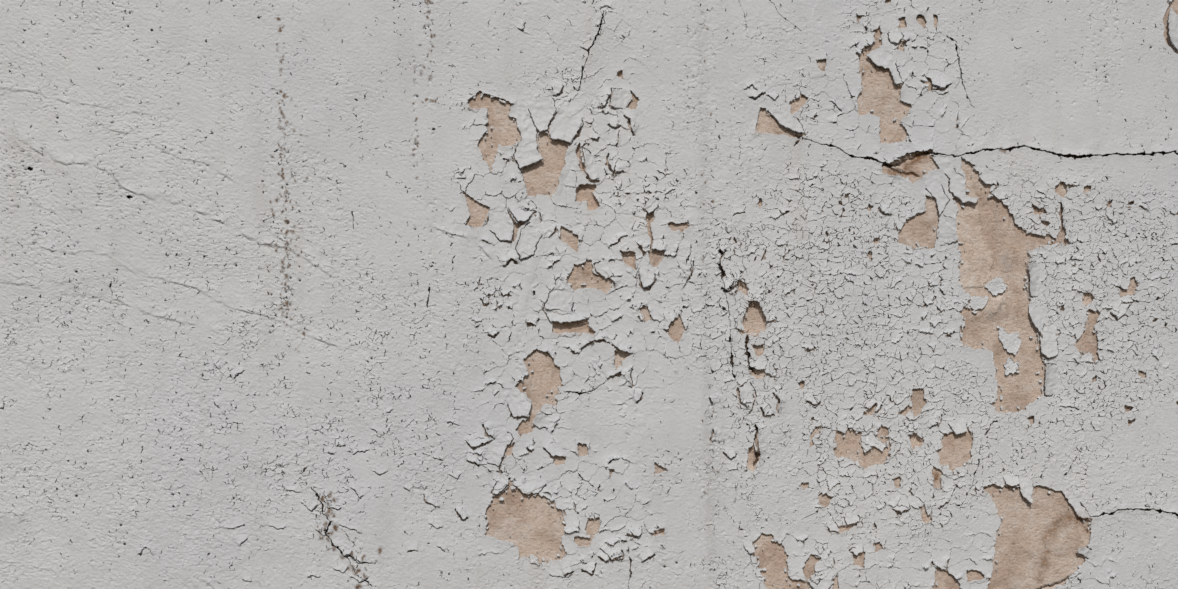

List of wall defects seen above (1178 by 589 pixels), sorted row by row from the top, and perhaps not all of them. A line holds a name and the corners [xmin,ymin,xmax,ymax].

peeling [1163,0,1178,54]
crack [794,135,1178,177]
peeling [157,0,1061,589]
crack [712,239,756,379]
peeling [985,161,1178,446]
crack [752,426,760,466]
crack [956,420,1000,508]
peeling [980,472,1131,589]
crack [1090,506,1178,517]